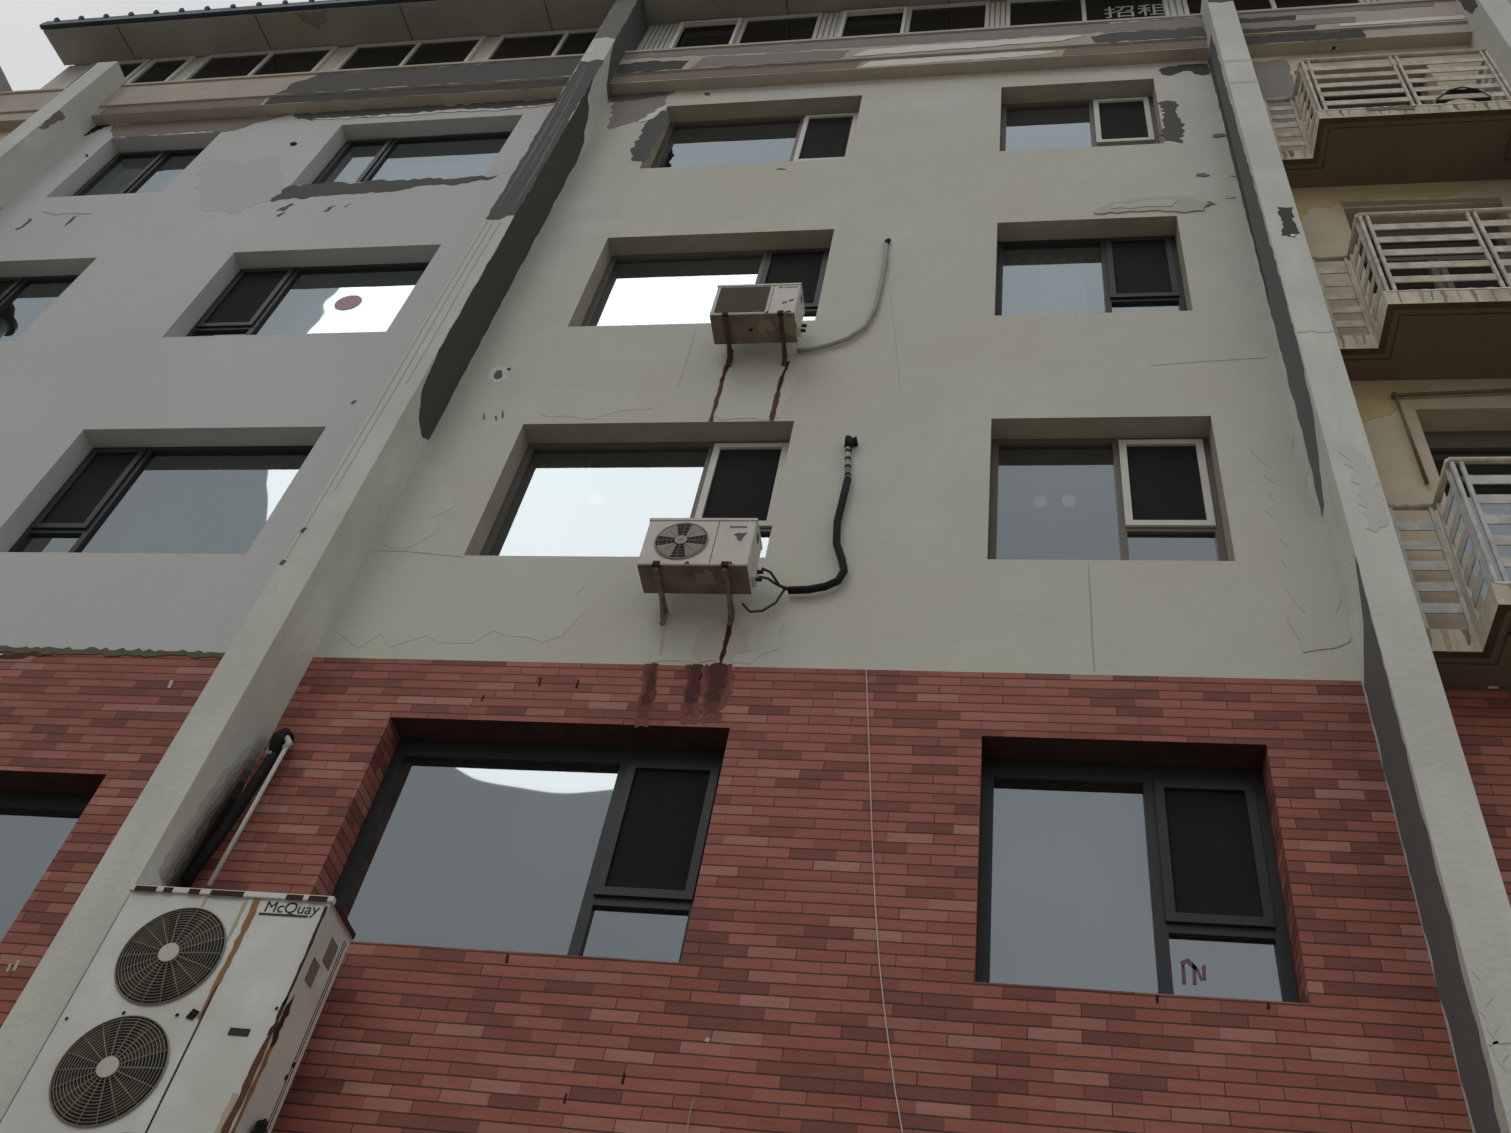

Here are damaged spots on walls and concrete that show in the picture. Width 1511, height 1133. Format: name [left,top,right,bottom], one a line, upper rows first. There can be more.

spalling [84,0,1324,516]
spalling [1239,0,1478,122]